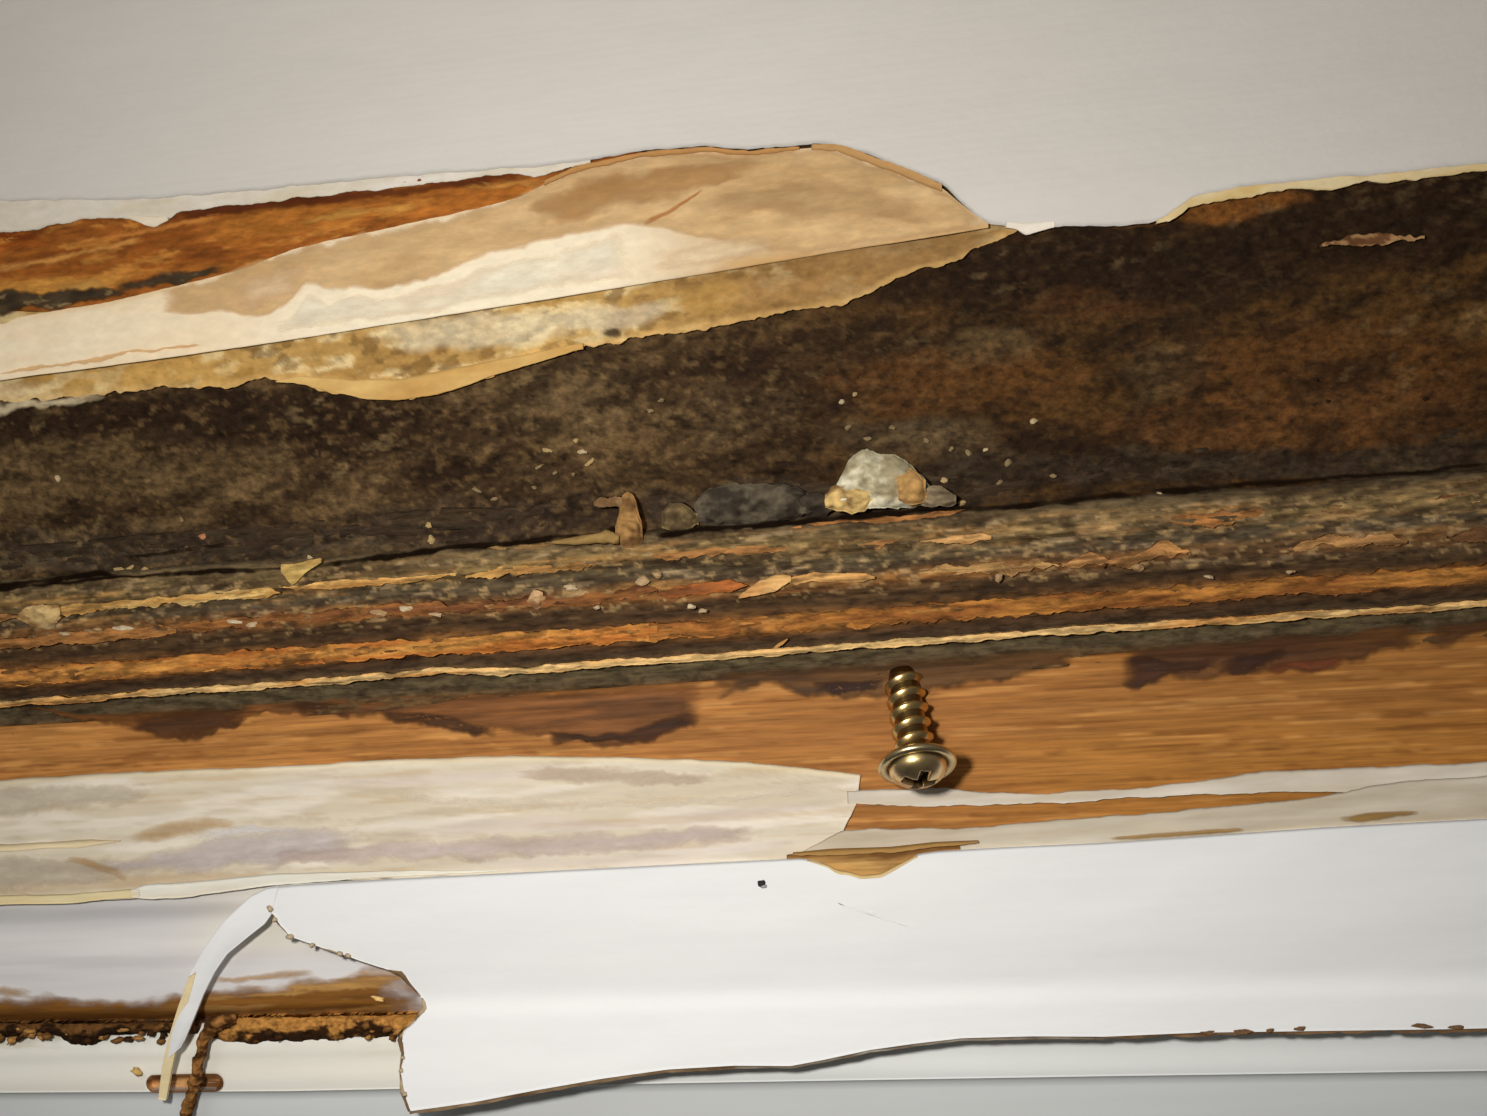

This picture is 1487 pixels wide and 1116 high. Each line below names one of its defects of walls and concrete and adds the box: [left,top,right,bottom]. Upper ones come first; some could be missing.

rust [0,168,570,312]
leakage [0,268,215,316]
flaking render [0,144,1487,580]
leakage [723,651,1068,699]
leakage [1126,627,1411,688]
leakage [40,685,695,746]
peeling [0,755,1487,1114]
leakage [0,990,181,1020]
leakage [195,972,413,1018]